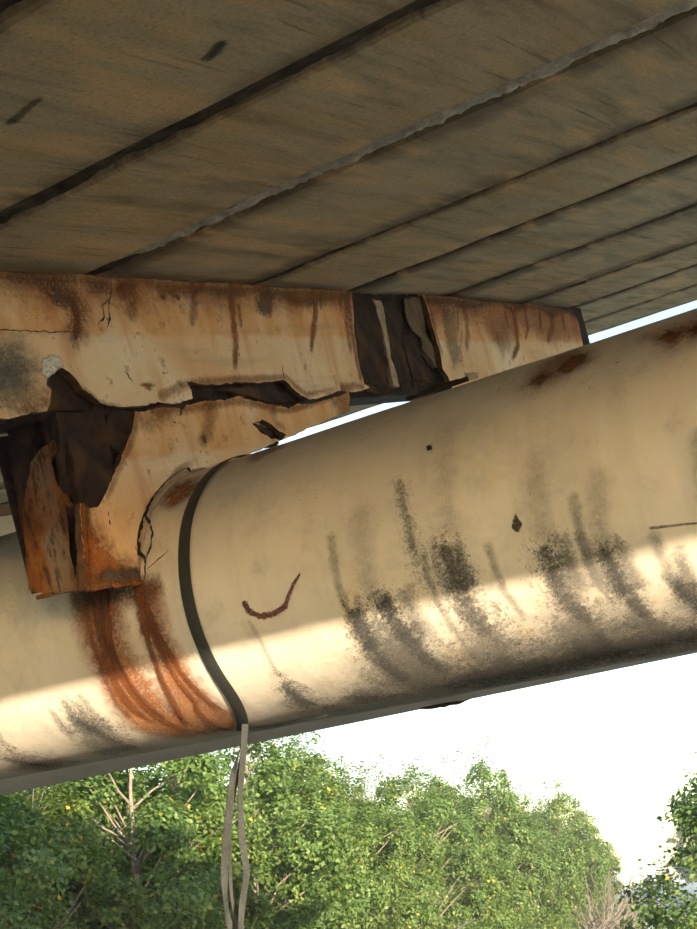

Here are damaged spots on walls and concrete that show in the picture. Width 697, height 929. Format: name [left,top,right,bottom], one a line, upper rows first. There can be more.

spalling [179,382,305,408]
spalling [0,355,133,518]
spalling [253,423,280,449]
peeling [86,567,141,591]
peeling [242,573,300,620]